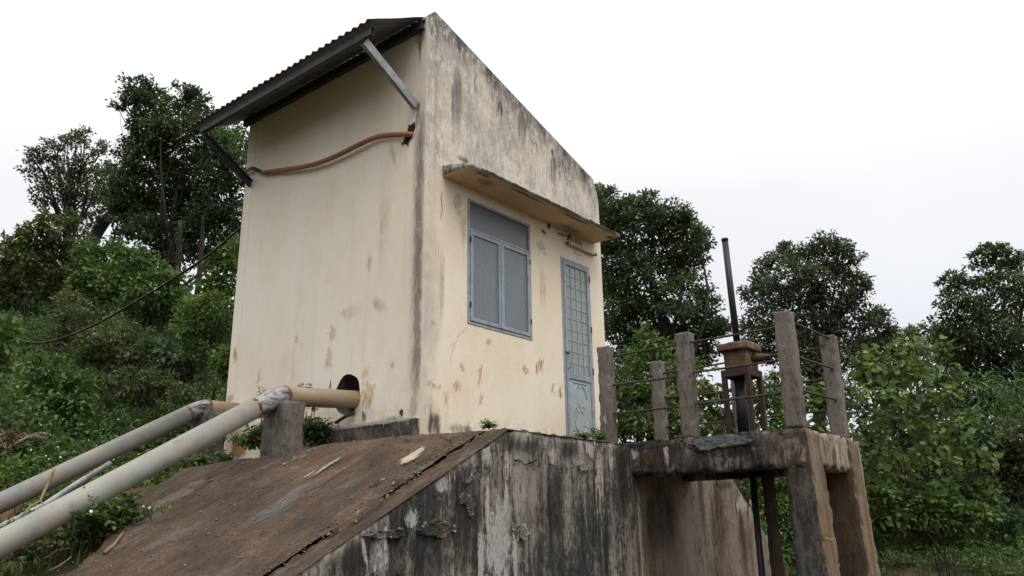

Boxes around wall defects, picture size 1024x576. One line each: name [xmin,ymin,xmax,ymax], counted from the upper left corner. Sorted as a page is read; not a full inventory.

water stain [452,74,460,107]
water stain [416,126,424,183]
water stain [477,168,617,243]
water stain [413,197,423,378]
water stain [399,447,423,463]
water stain [663,447,695,466]
spalling [327,466,456,576]
efflorescence [406,509,418,528]
water stain [436,435,672,576]
water stain [736,495,752,525]
water stain [339,526,388,575]